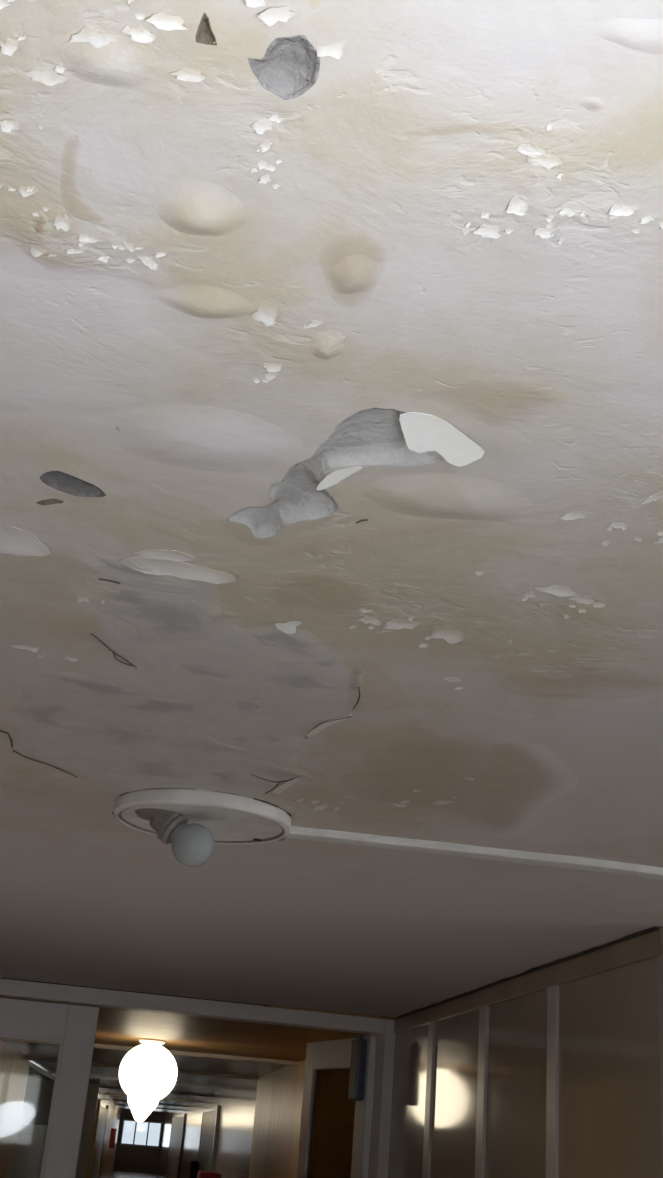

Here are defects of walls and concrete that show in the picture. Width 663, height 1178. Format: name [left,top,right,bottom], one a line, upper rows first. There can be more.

spalling [70,0,354,189]
peeling [516,142,564,179]
peeling [462,213,513,239]
peeling [506,195,528,216]
peeling [609,205,663,234]
spalling [20,460,125,509]
spalling [205,393,485,546]
crack [90,633,137,669]
crack [305,687,360,739]
crack [0,731,78,778]
crack [250,774,299,794]
damp [301,715,579,837]